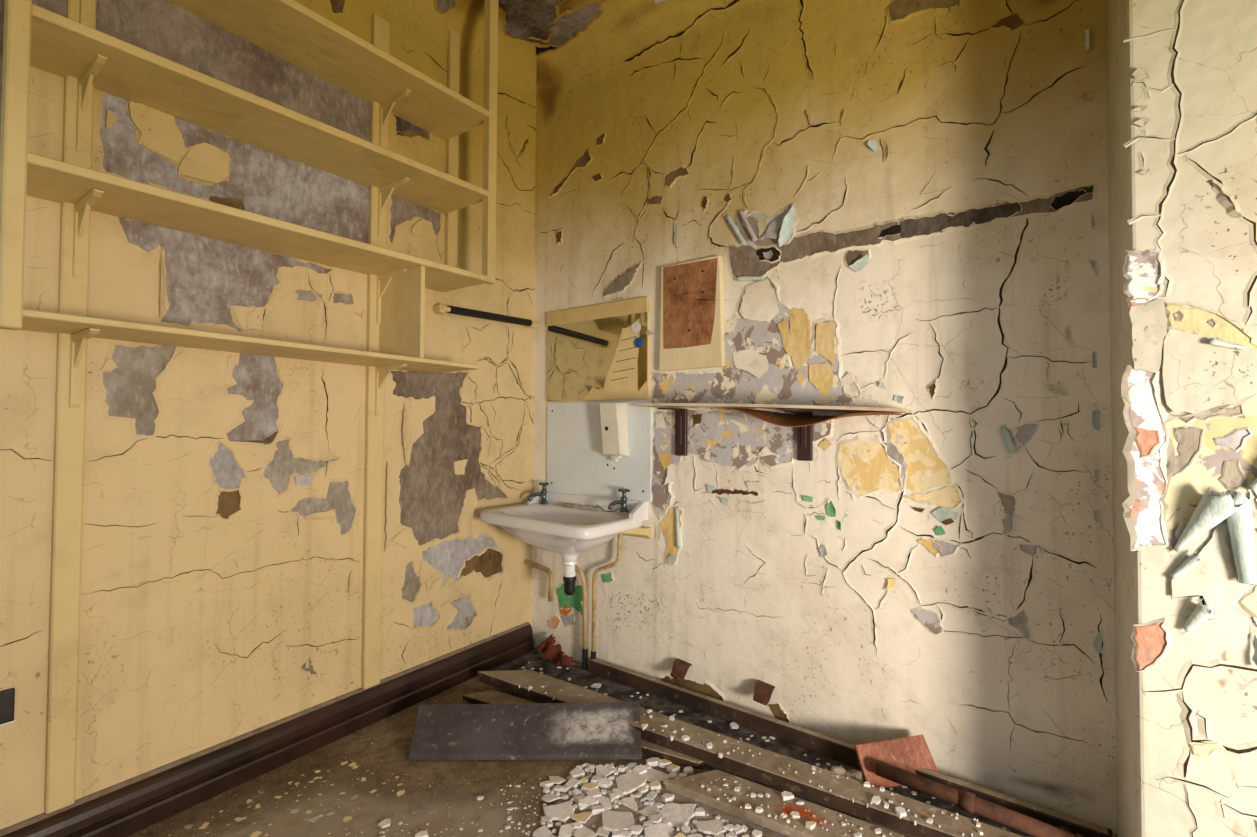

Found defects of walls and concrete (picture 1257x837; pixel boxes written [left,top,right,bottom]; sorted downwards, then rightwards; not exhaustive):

peeling [93,90,369,244]
peeling [96,0,370,142]
crack [592,0,838,297]
crack [1123,0,1257,326]
crack [81,556,336,596]
peeling [96,341,358,538]
peeling [385,369,509,666]
crack [457,272,535,492]
peeling [635,182,1100,596]
crack [793,0,1098,750]
peeling [1121,248,1257,673]
crack [1142,616,1257,837]